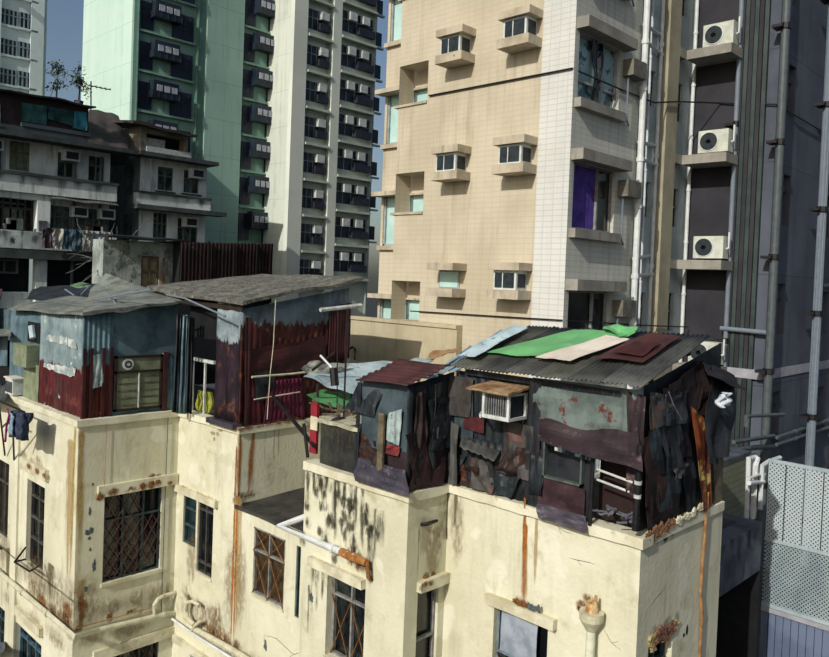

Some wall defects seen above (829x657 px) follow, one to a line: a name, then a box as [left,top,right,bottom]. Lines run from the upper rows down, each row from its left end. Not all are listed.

corrosion [71,428,84,544]
corrosion [128,474,172,491]
corrosion [231,417,303,627]
water stain [306,471,383,567]
corrosion [200,619,238,649]